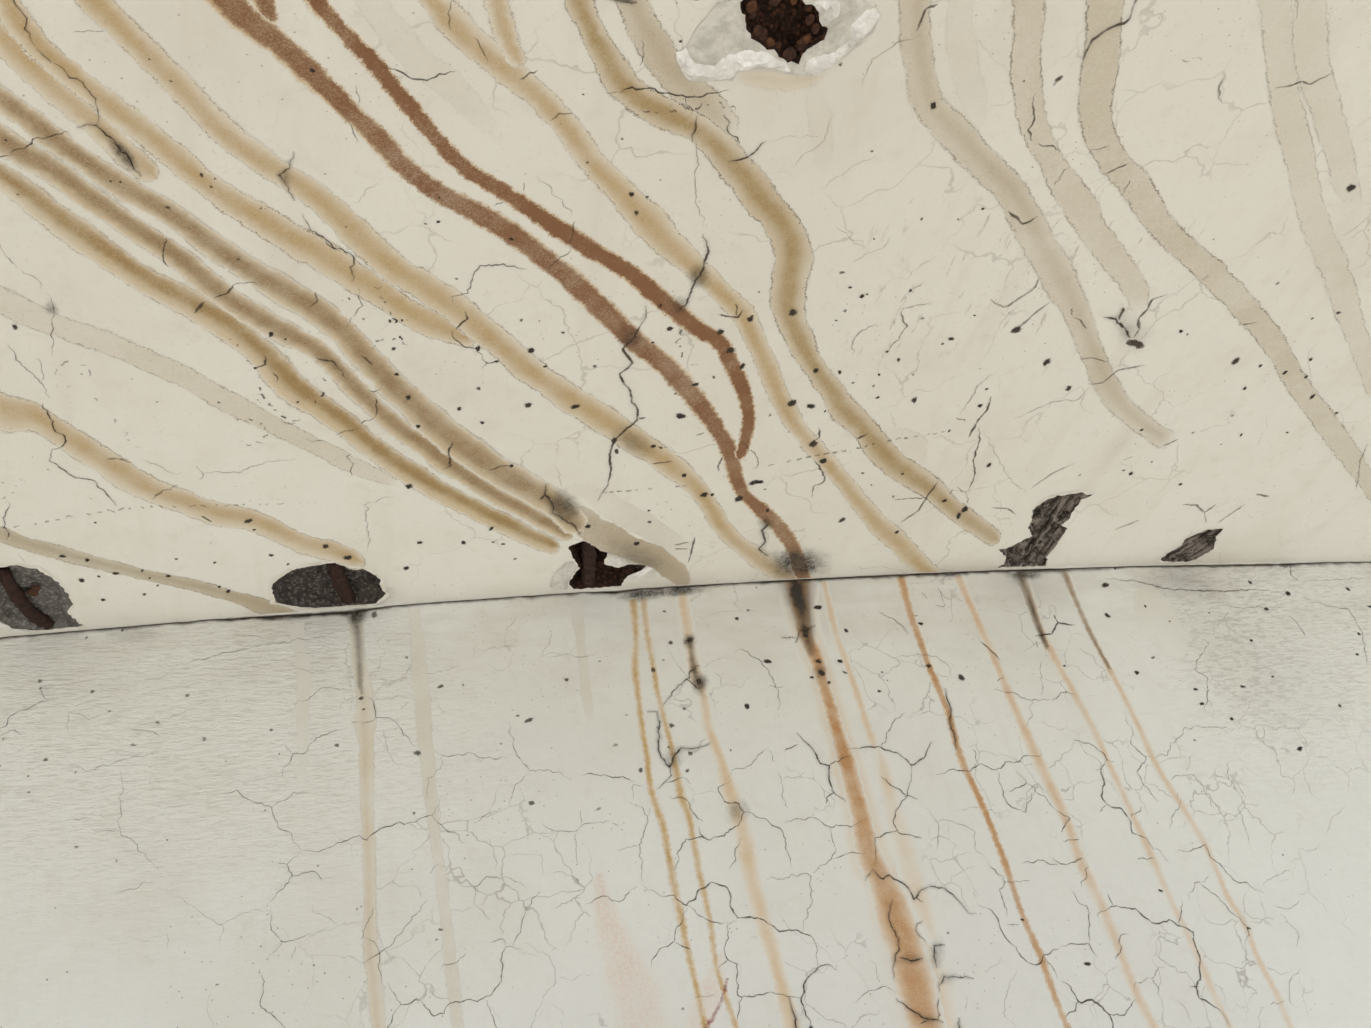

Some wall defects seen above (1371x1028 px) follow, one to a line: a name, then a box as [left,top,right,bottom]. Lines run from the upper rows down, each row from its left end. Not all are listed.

spalling [0,563,83,633]
spalling [268,561,389,610]
damp [0,0,804,1028]
rust [204,0,969,1028]
damp [353,0,1001,573]
crack [0,524,1359,638]
crack [652,696,1217,1028]
rust [895,575,1072,1028]
spalling [997,490,1094,570]
crack [1071,299,1154,349]
damp [897,0,1371,502]
rust [1014,569,1296,1028]